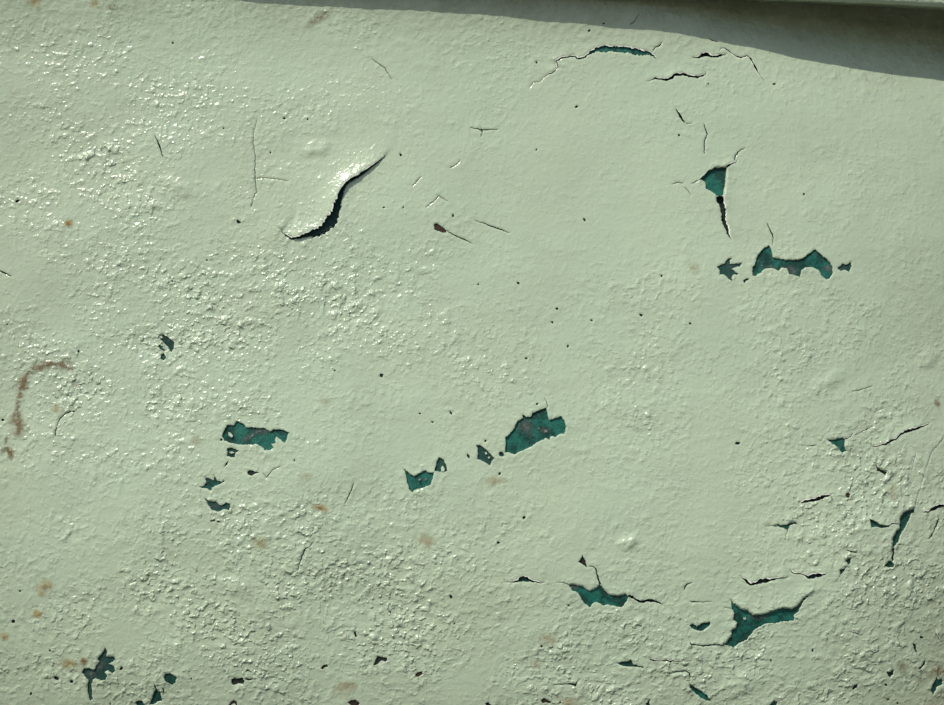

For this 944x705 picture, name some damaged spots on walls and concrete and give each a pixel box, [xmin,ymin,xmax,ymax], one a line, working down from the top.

crack [531,13,764,85]
peeling [674,149,743,240]
peeling [717,223,852,283]
peeling [220,421,290,467]
peeling [467,400,567,475]
peeling [199,475,231,523]
peeling [403,457,447,493]
peeling [557,555,663,608]
peeling [690,592,813,648]
peeling [54,648,123,701]